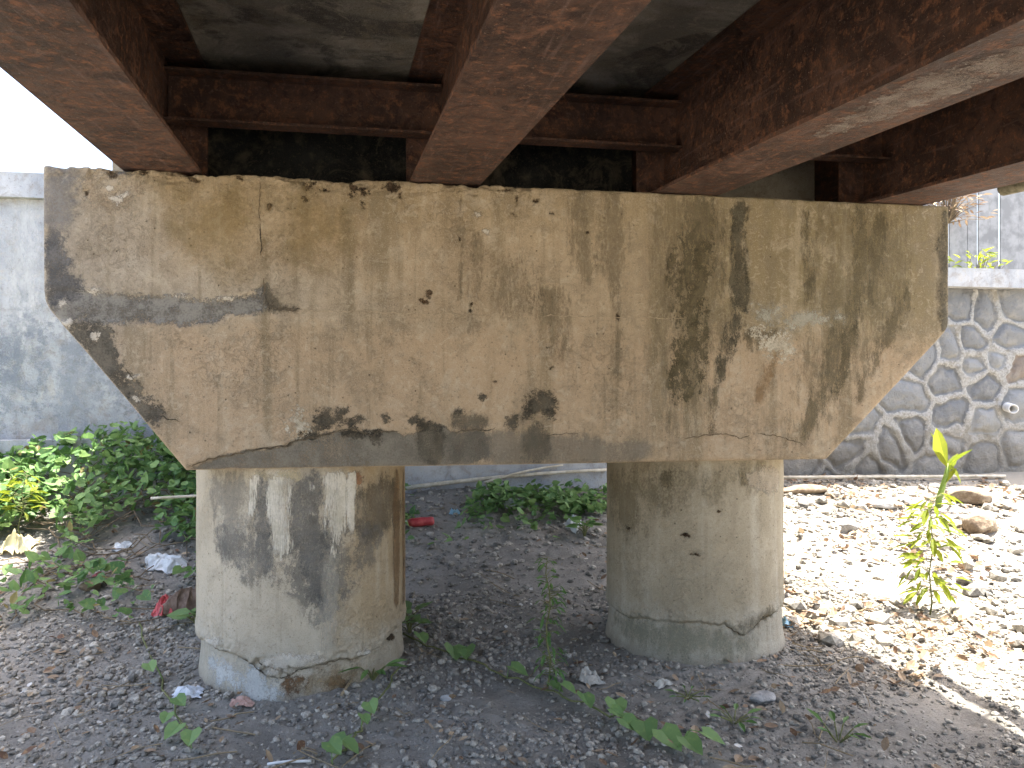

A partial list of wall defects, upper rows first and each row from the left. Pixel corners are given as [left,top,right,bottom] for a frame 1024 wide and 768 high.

damp [665,197,886,440]
damp [858,288,911,400]
damp [283,405,393,446]
damp [408,409,488,465]
damp [504,388,559,462]
damp [247,468,401,618]
crack [204,633,395,679]
crack [686,608,778,635]